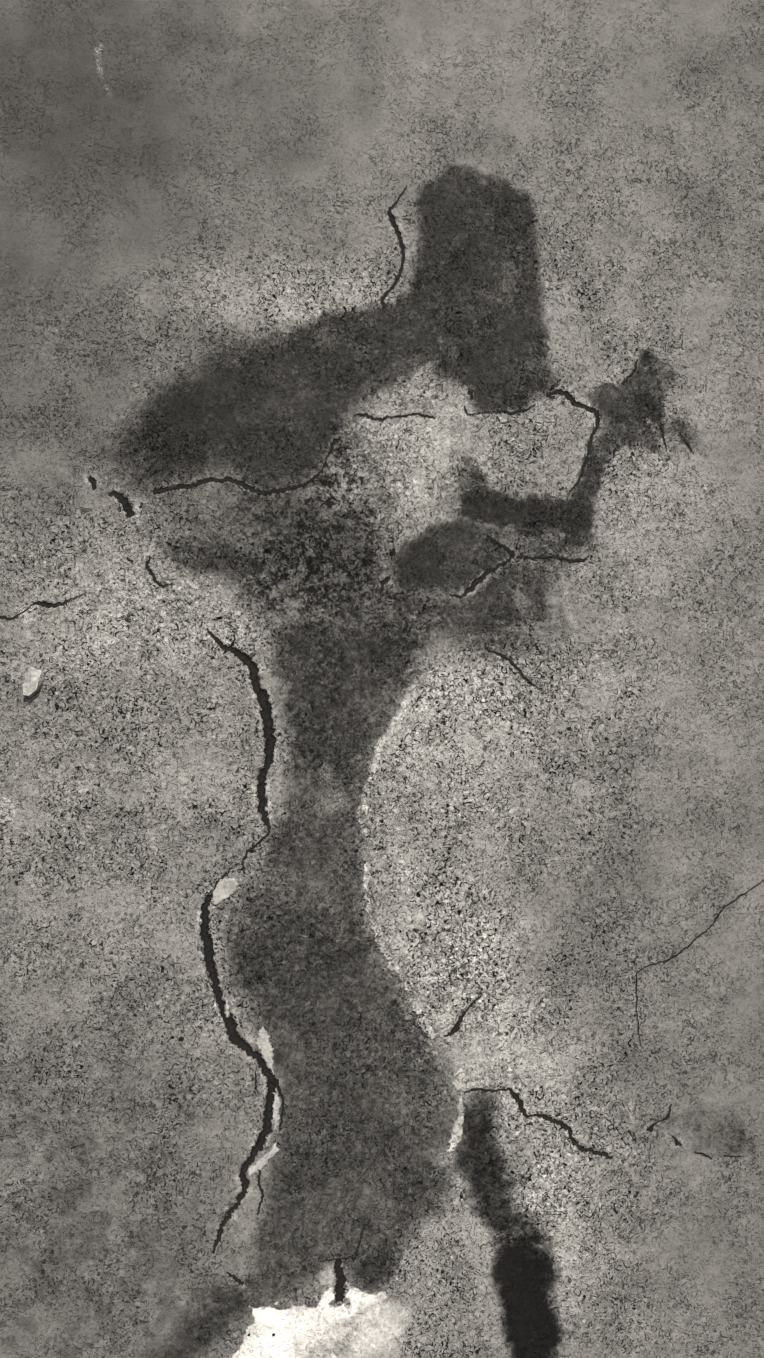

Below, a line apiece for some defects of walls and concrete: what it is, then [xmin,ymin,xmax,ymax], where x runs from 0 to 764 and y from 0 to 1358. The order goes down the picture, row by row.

crack [380,185,407,307]
leakage [119,166,685,1358]
crack [199,628,284,1286]
crack [464,1088,614,1159]
flaking render [232,1287,402,1358]